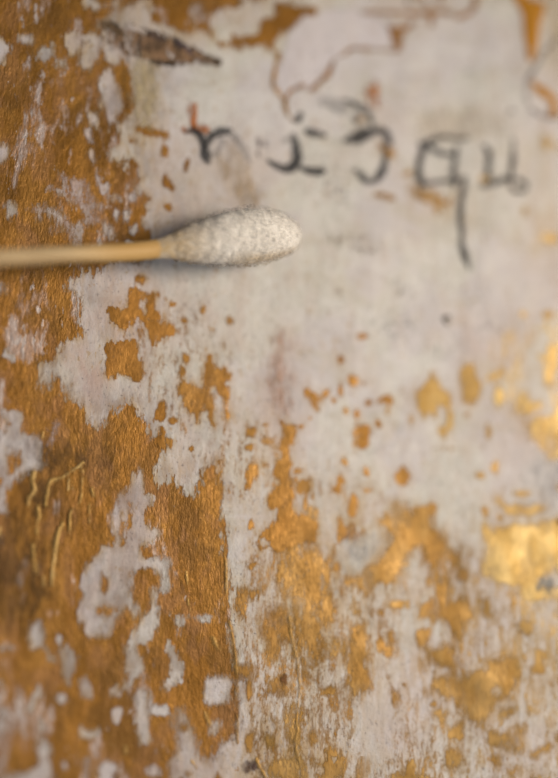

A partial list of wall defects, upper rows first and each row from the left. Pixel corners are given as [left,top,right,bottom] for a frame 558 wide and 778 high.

peeling [0,34,34,66]
peeling [65,29,104,71]
spalling [97,20,222,68]
peeling [98,67,124,124]
peeling [35,171,116,245]
peeling [0,409,60,514]
peeling [77,469,172,698]
peeling [0,685,53,778]
peeling [27,619,93,704]
peeling [134,688,170,746]
peeling [160,639,184,691]
peeling [203,676,232,706]